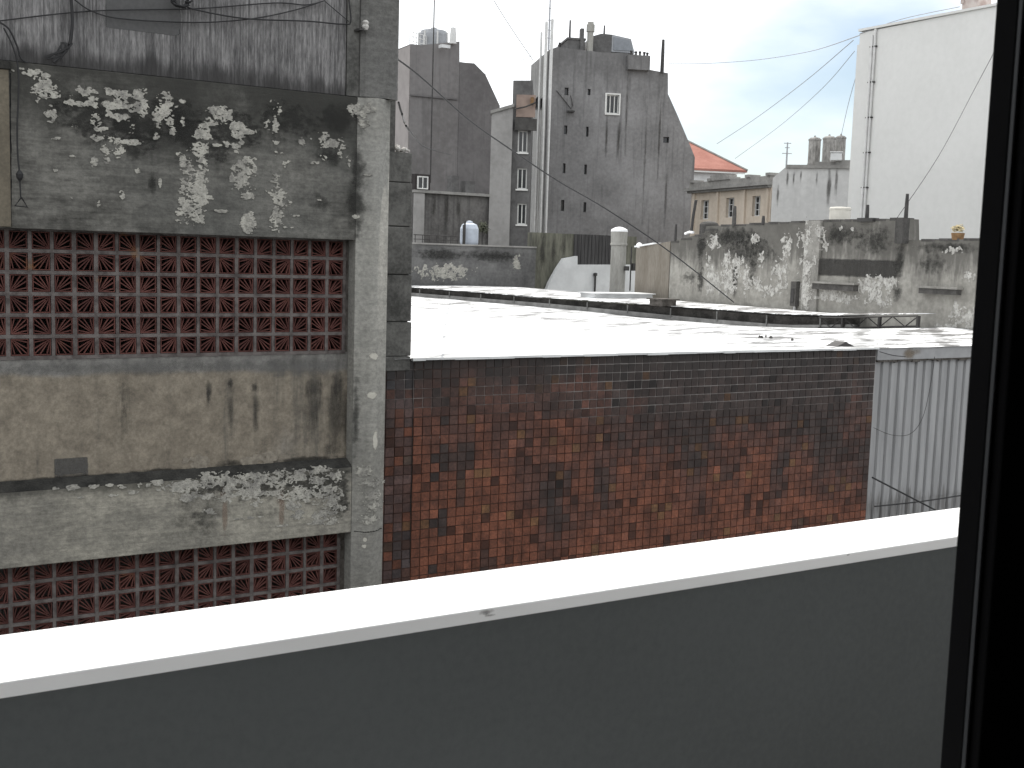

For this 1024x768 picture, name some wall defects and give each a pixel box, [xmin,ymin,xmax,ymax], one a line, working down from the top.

peeling [11,67,300,234]
peeling [298,132,351,167]
leakage [347,153,363,225]
peeling [411,262,478,282]
peeling [702,216,899,311]
leakage [818,234,903,278]
peeling [933,301,975,329]
leakage [329,380,358,439]
peeling [52,451,385,548]